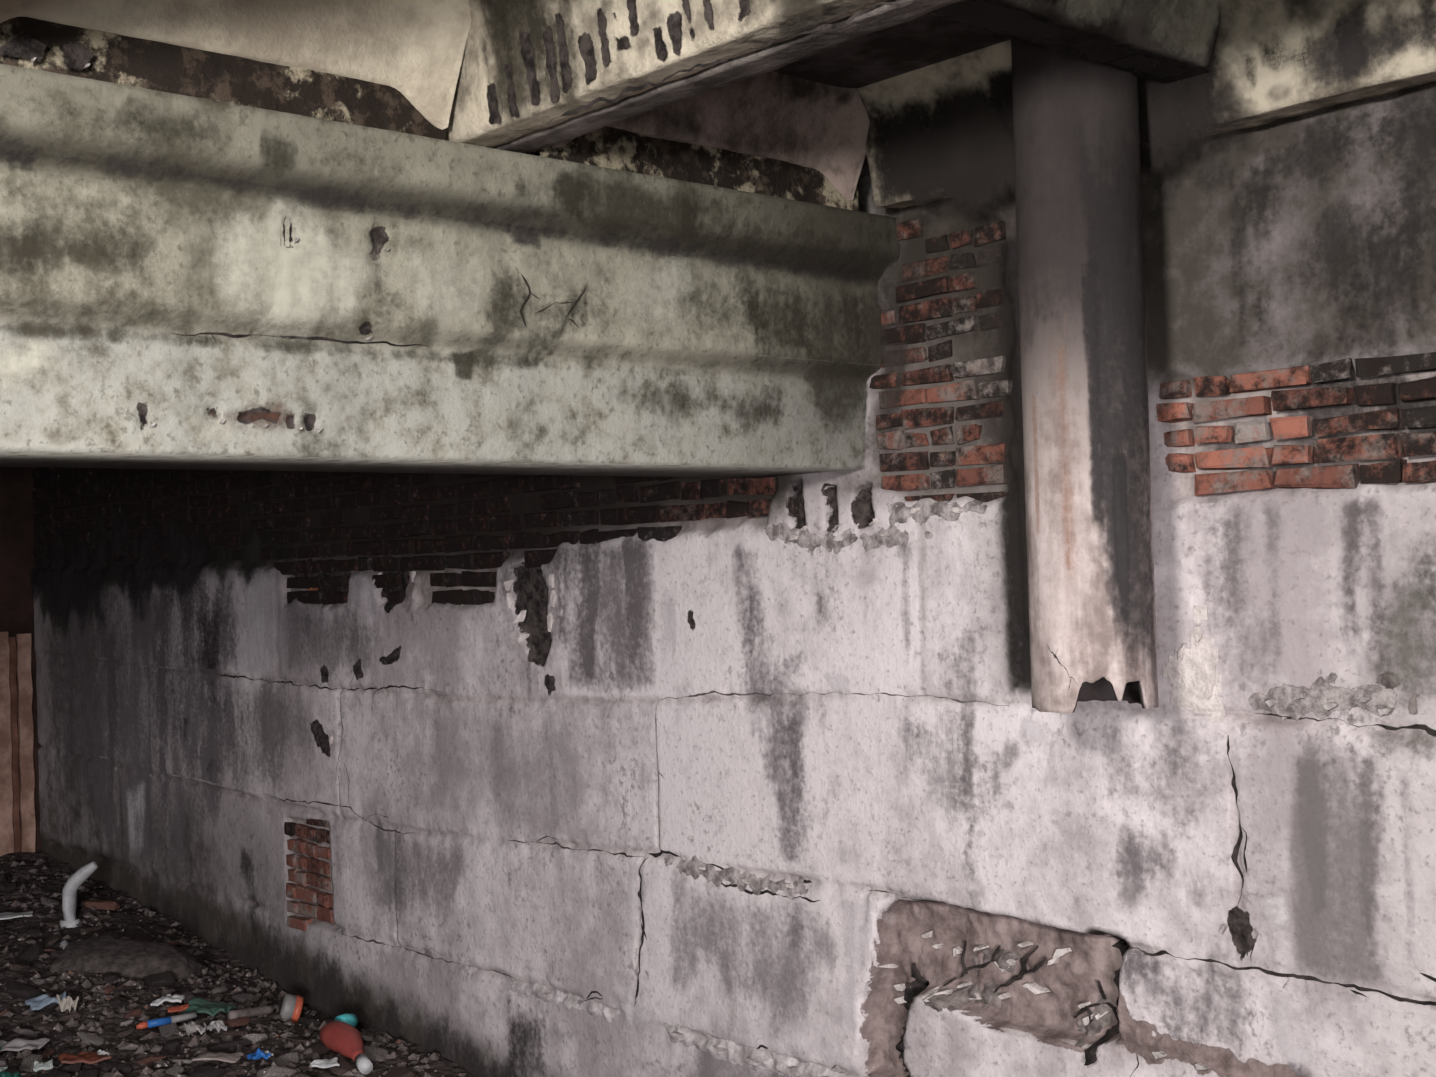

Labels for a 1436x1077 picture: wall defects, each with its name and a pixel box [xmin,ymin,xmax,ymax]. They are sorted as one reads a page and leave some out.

leakage [218,202,379,352]
crack [172,332,431,348]
leakage [453,350,498,379]
leakage [553,175,758,325]
spalling [764,483,988,554]
flaking render [504,562,558,695]
flaking render [687,610,696,630]
crack [510,691,1009,1006]
leakage [1267,749,1376,968]
crack [1227,713,1436,908]
spalling [860,900,1129,1077]
crack [1128,945,1436,1006]